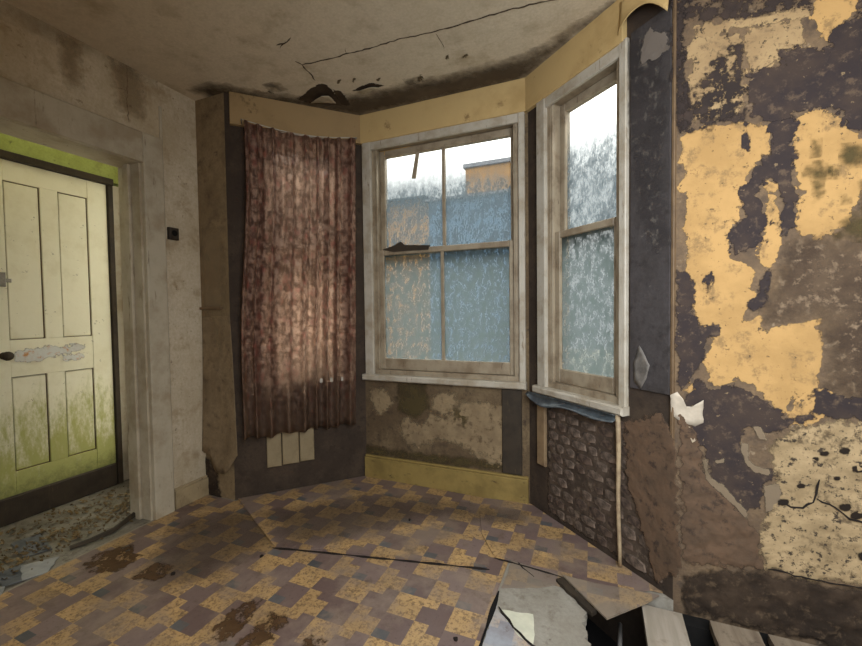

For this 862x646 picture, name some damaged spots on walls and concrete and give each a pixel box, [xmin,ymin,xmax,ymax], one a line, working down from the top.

flaking render [300,83,384,106]
damp [196,36,567,115]
crack [277,0,553,80]
peeling [640,27,670,64]
damp [670,0,862,255]
flaking render [677,0,862,646]
flaking render [369,387,394,416]
flaking render [400,393,502,468]
damp [674,218,862,512]